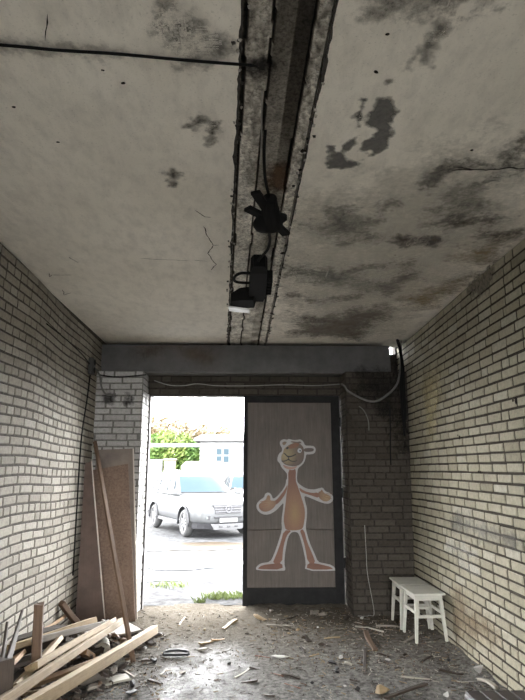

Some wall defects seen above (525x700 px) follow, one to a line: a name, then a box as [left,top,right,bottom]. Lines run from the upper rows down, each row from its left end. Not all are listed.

damp [183,117,219,143]
crack [452,165,525,173]
damp [388,235,441,248]
damp [289,306,385,339]